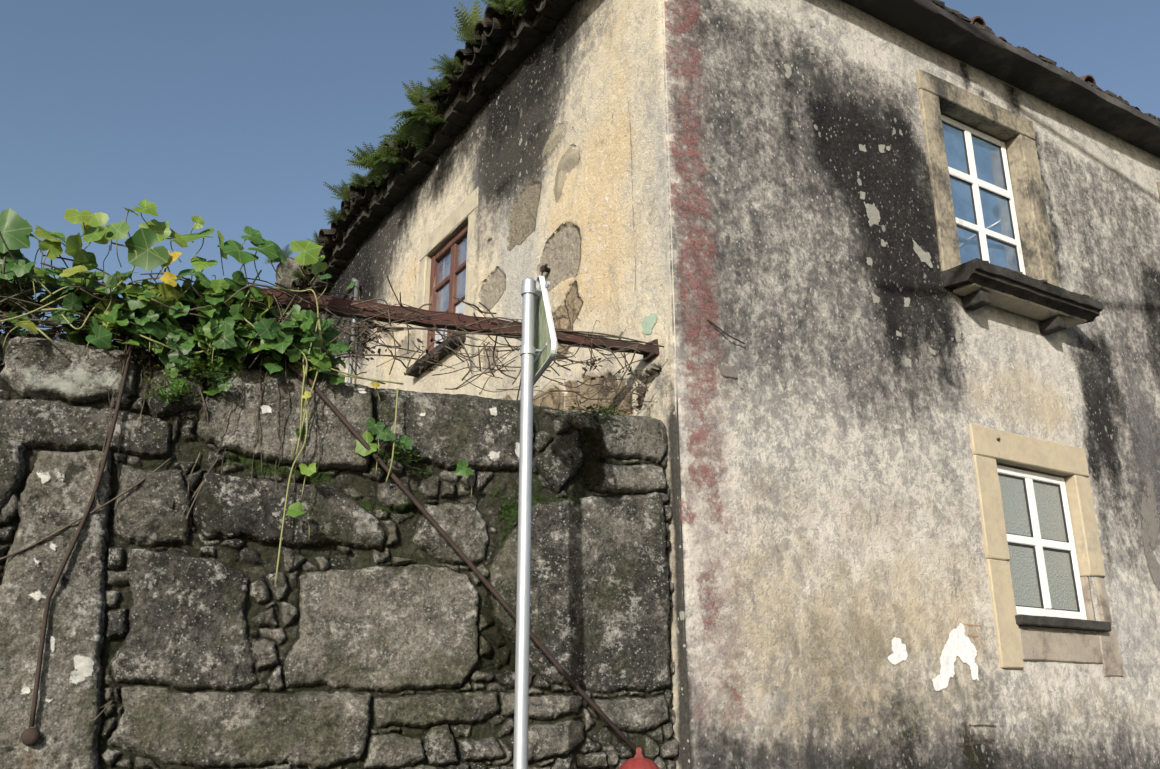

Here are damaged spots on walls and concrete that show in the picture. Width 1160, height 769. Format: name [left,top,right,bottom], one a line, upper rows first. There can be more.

damp [479,7,571,150]
damp [324,210,391,301]
flaking render [478,266,506,315]
flaking render [507,181,541,250]
flaking render [536,221,583,330]
damp [807,91,961,399]
damp [1142,263,1160,375]
flaking render [533,368,662,416]
damp [1071,334,1160,525]
peeling [888,637,908,665]
peeling [932,623,982,691]
damp [960,732,999,769]